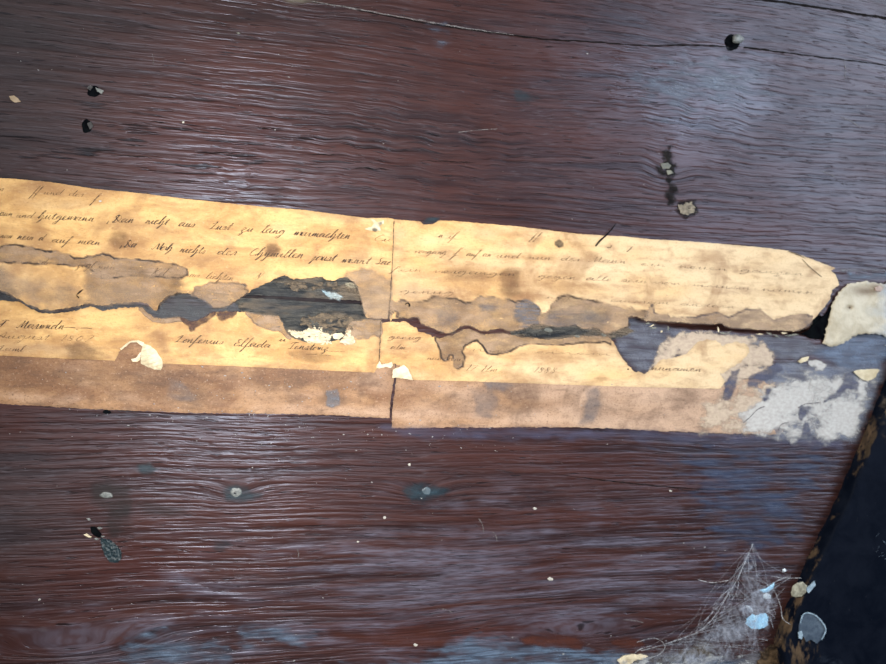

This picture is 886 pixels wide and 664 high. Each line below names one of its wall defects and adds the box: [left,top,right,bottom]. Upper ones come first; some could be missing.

crack [299,0,886,66]
peeling [0,290,240,321]
peeling [521,327,555,336]